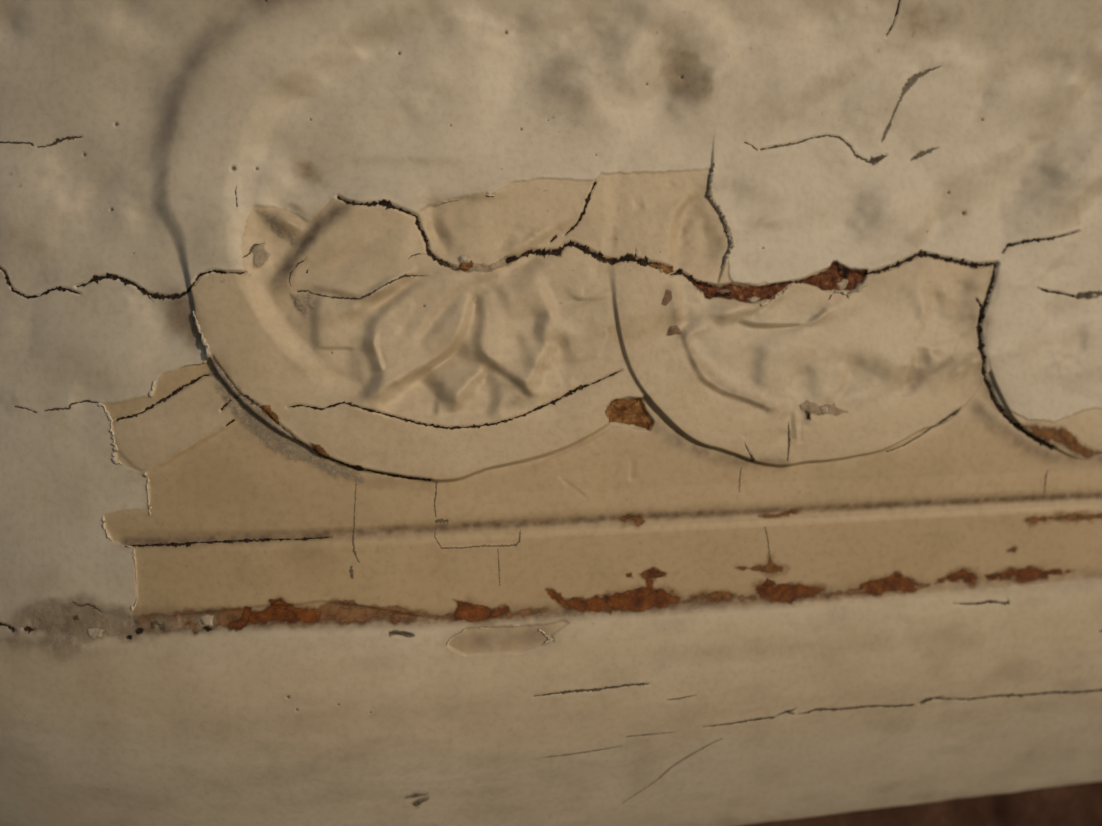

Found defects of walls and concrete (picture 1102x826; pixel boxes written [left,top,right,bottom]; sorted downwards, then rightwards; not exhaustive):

crack [744,65,942,165]
crack [0,244,260,300]
crack [289,196,456,300]
crack [518,181,712,287]
peeling [432,163,867,327]
spalling [1076,291,1102,299]
peeling [34,304,362,641]
crack [14,356,621,586]
spalling [605,398,654,430]
rust [1025,426,1101,457]
peeling [446,621,569,655]
rust [134,559,1070,632]